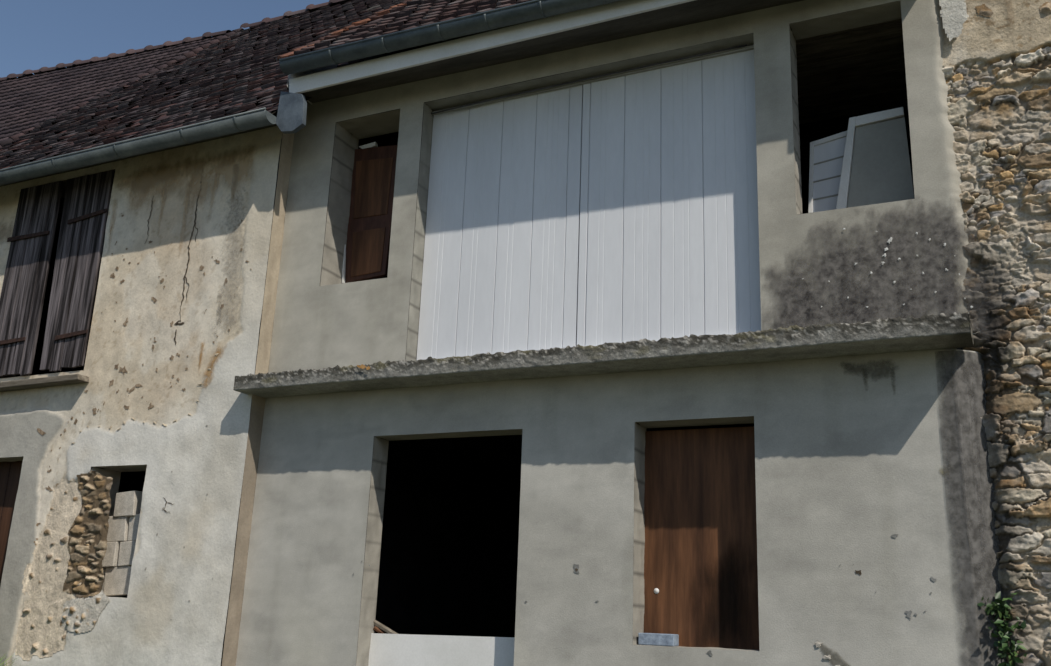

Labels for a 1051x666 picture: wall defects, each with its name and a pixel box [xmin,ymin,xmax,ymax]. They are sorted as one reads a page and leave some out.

crack [174,167,203,345]
damp [768,210,981,329]
corrosion [199,343,221,387]
spalling [15,363,191,662]
damp [937,350,1009,666]